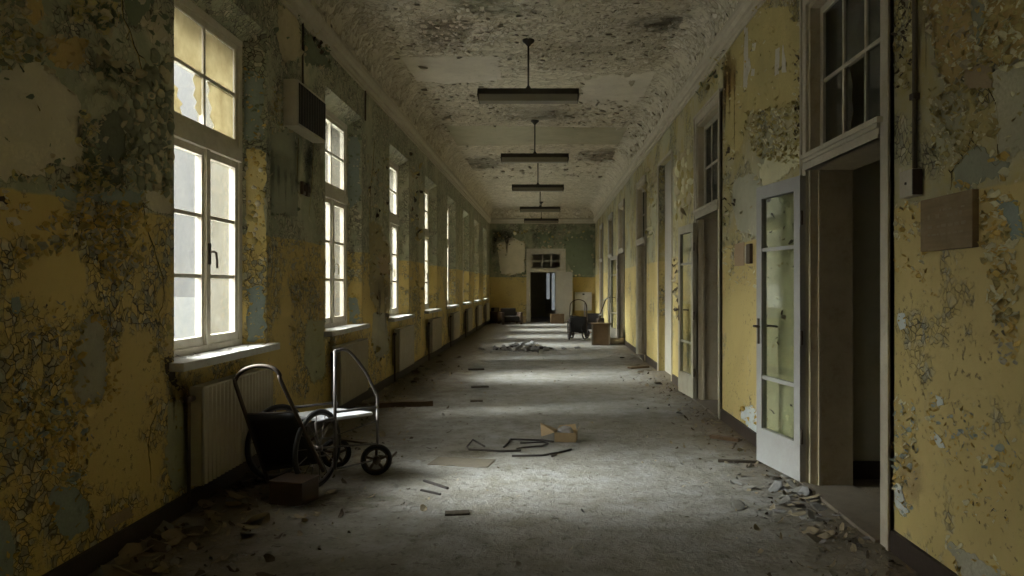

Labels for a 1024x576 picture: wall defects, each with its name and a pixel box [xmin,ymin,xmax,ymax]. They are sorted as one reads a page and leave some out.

flaking render [0,0,175,220]
flaking render [362,2,509,85]
flaking render [460,72,671,179]
flaking render [940,0,1024,158]
flaking render [146,309,186,391]
flaking render [245,284,268,343]
flaking render [721,48,799,439]
peeling [897,313,908,330]
peeling [892,201,937,296]
flaking render [977,189,1024,367]
flaking render [890,392,1017,527]
flaking render [945,535,1005,576]